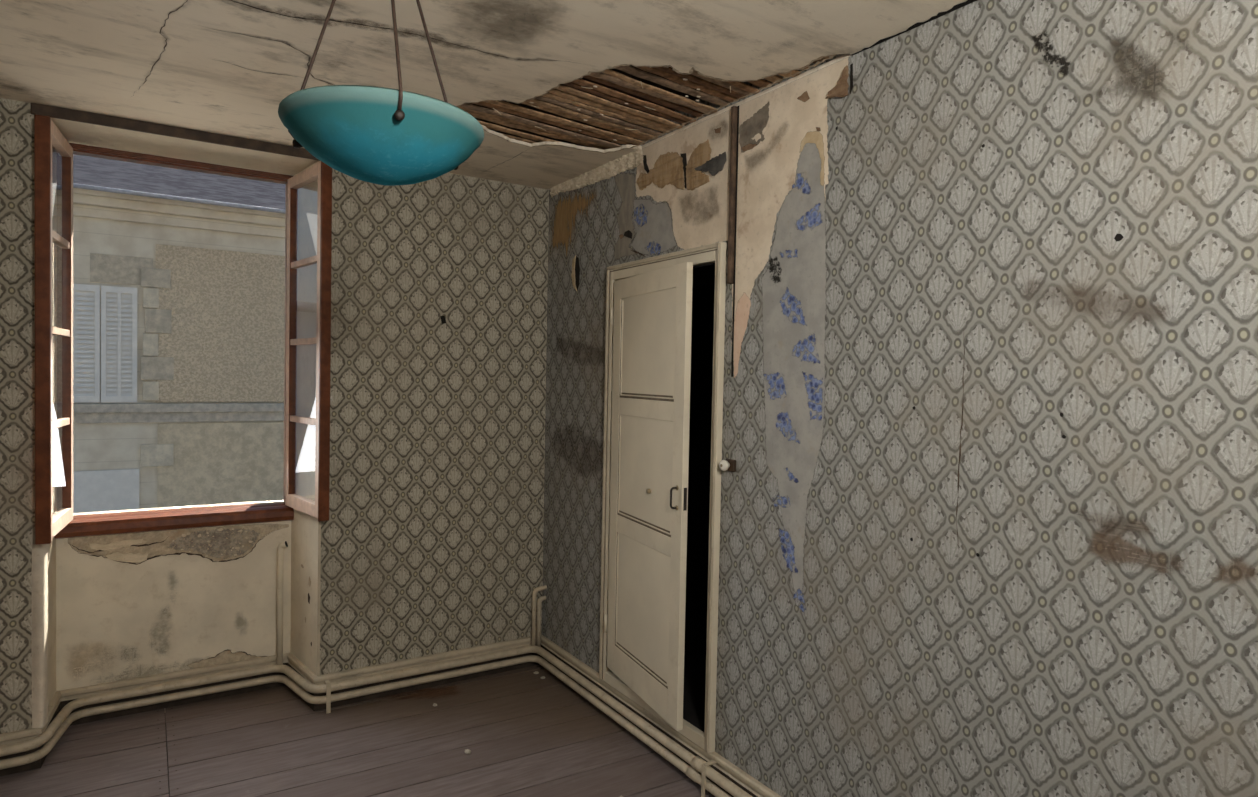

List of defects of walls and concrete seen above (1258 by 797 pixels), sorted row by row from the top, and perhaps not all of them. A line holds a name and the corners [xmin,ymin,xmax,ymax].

crack [131,0,574,97]
damp [1032,32,1070,75]
damp [1113,38,1161,96]
flaking render [549,57,849,378]
spalling [68,524,289,565]